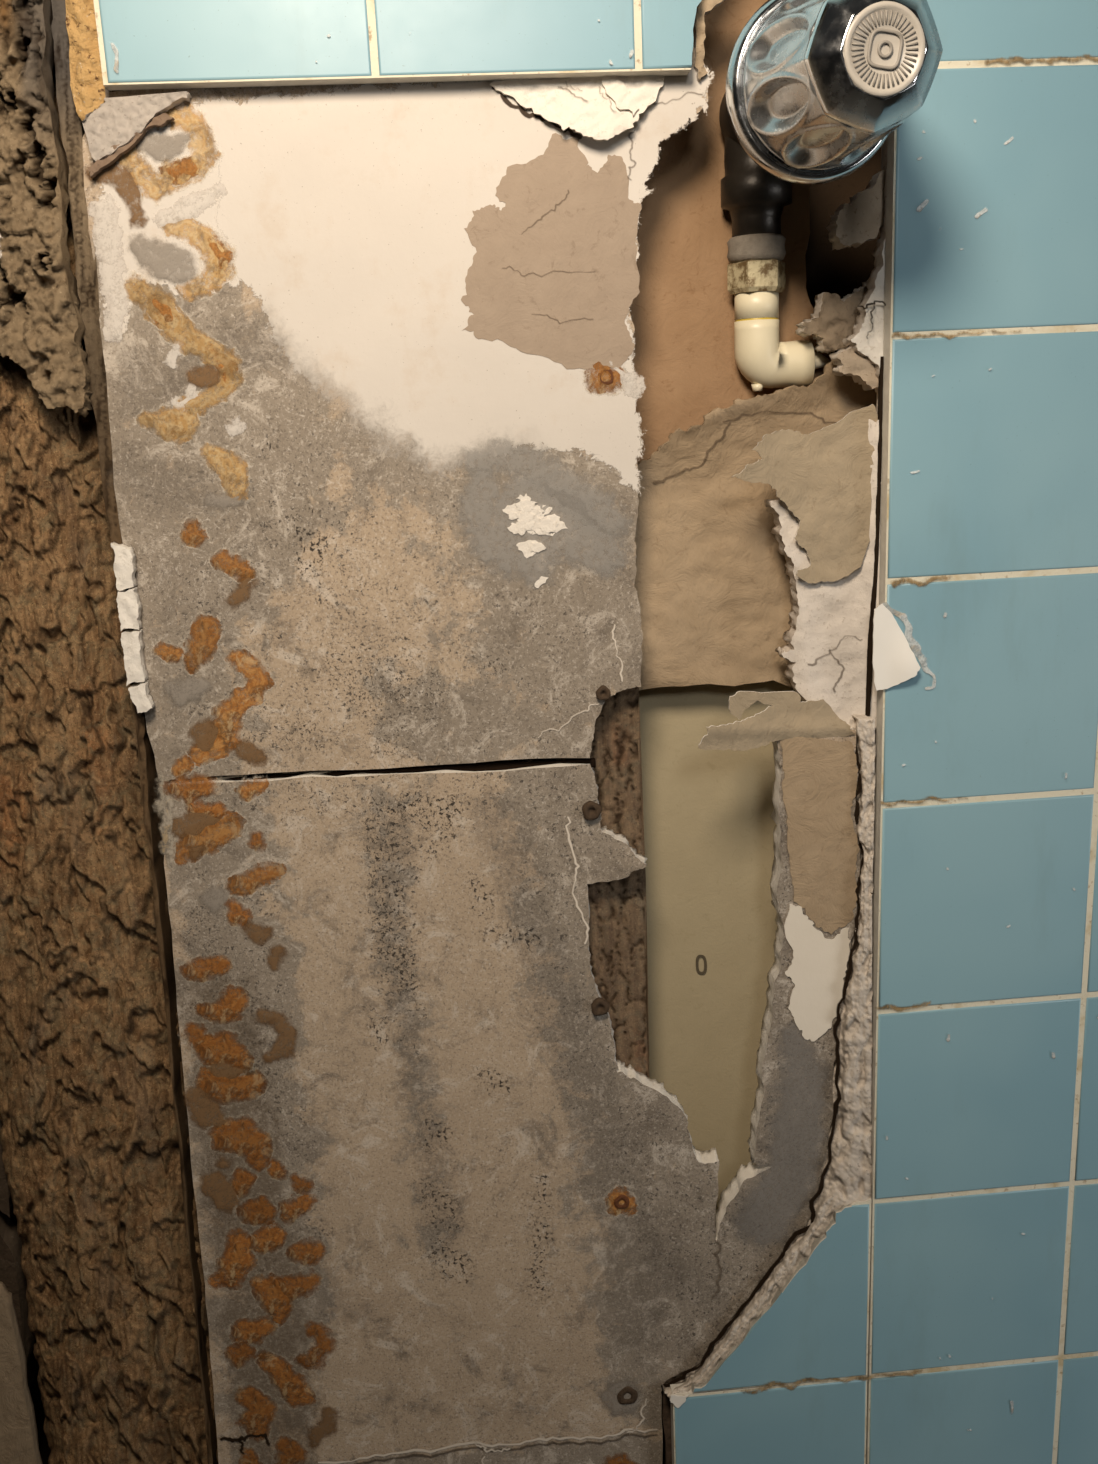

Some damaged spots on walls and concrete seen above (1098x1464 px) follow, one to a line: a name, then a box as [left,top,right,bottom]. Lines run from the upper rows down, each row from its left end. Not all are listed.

crack [492,87,582,139]
peeling [82,65,714,588]
corrosion [583,361,626,395]
spalling [795,170,886,393]
water stain [288,507,328,579]
corrosion [151,517,287,971]
crack [156,624,623,789]
water stain [365,791,463,997]
water stain [468,872,542,949]
crack [318,300,886,1464]
spalling [662,419,921,1408]
corrosion [180,956,337,1464]